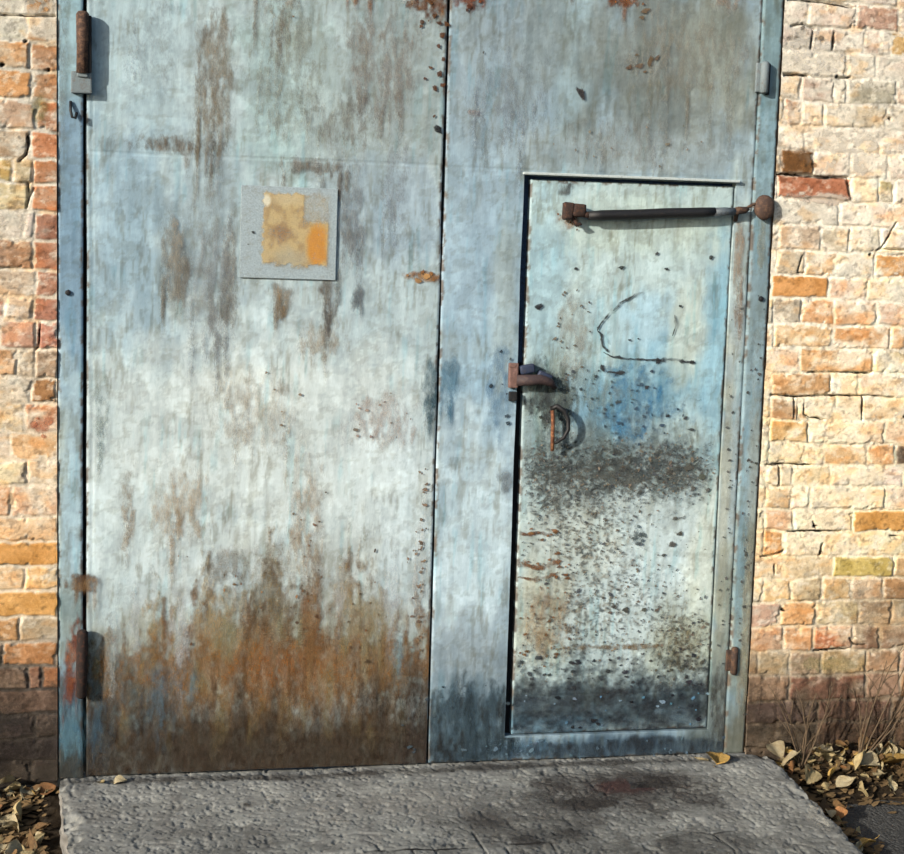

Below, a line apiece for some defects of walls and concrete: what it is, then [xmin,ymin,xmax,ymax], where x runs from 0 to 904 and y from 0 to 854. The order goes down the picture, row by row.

rust [406,0,485,91]
rust [609,0,644,17]
rust [406,270,439,283]
rust [63,531,430,776]
water stain [0,696,81,789]
water stain [419,652,726,763]
water stain [745,685,897,760]
crack [365,835,484,854]